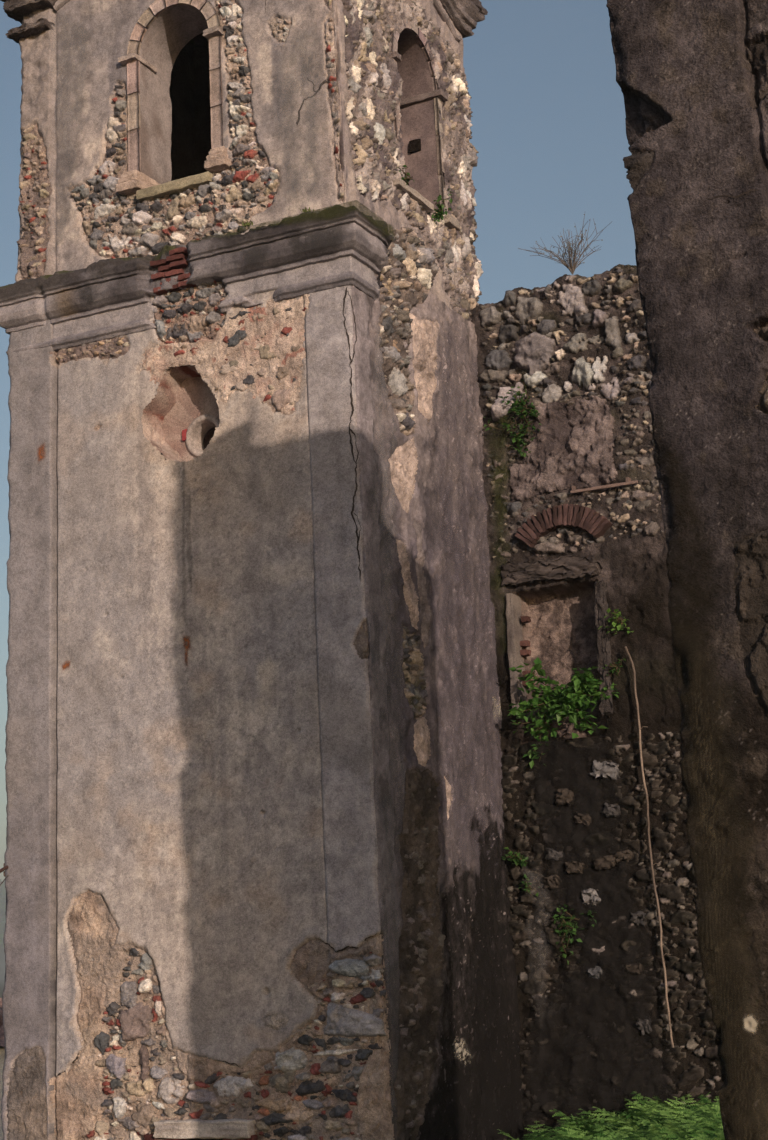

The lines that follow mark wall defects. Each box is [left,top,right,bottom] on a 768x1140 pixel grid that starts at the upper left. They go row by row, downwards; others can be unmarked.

crack [296,78,328,125]
spalling [5,0,483,1140]
crack [343,287,361,582]
water stain [409,698,678,1140]
water stain [652,427,758,1140]